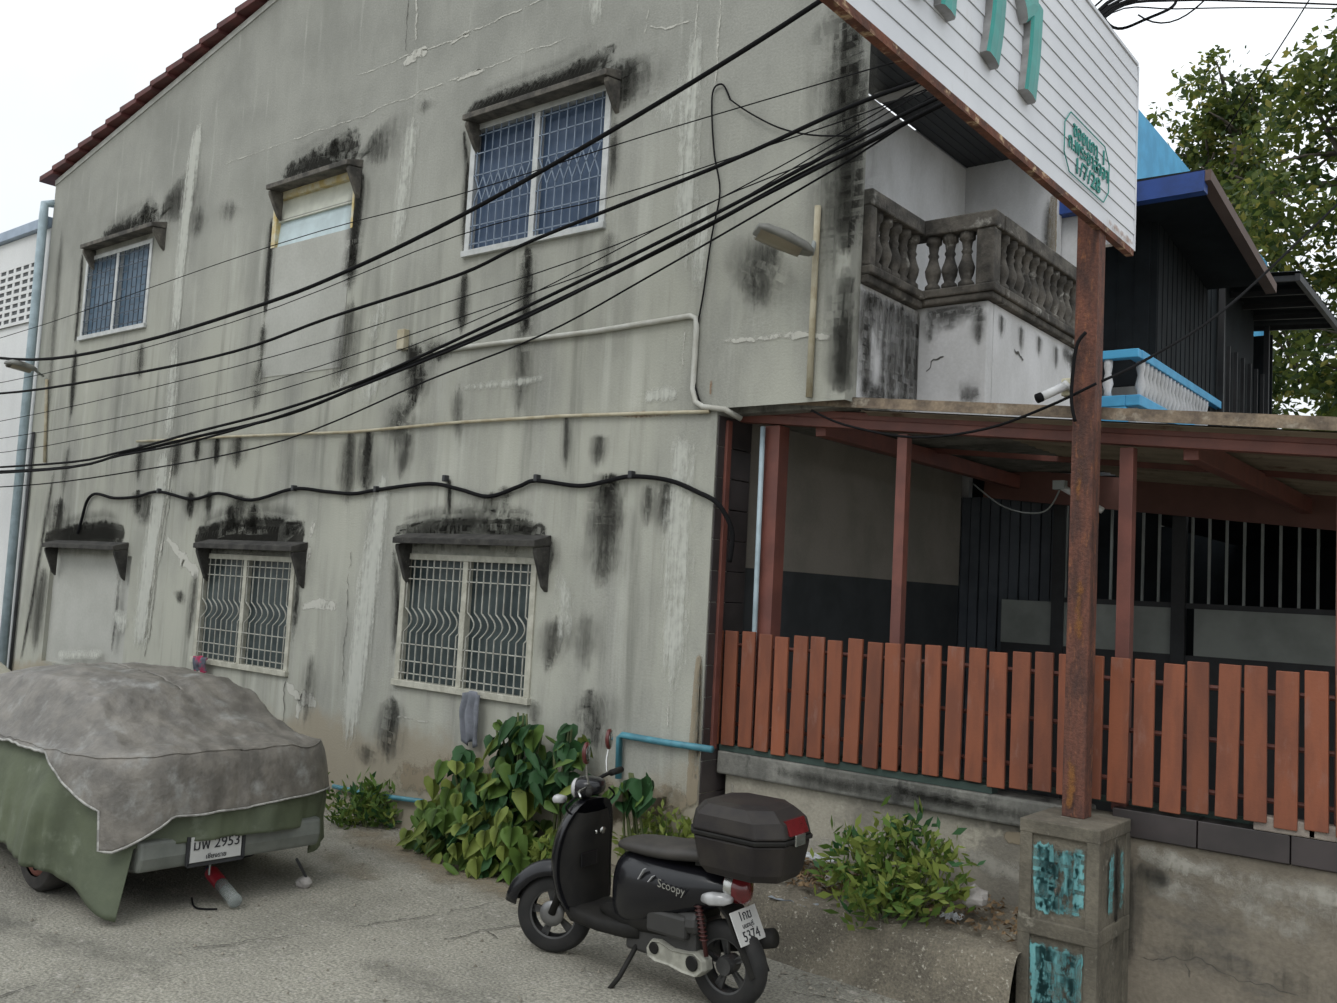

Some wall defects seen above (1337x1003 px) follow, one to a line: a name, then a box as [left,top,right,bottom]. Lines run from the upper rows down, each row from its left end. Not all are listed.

damp [104,126,202,328]
damp [347,174,364,290]
crack [227,0,561,164]
damp [467,45,638,113]
crack [592,0,601,21]
crack [644,0,721,81]
damp [661,40,709,282]
damp [827,17,982,400]
damp [134,348,241,645]
damp [344,432,554,738]
peeling [966,832,1085,916]
peeling [1029,942,1083,1003]